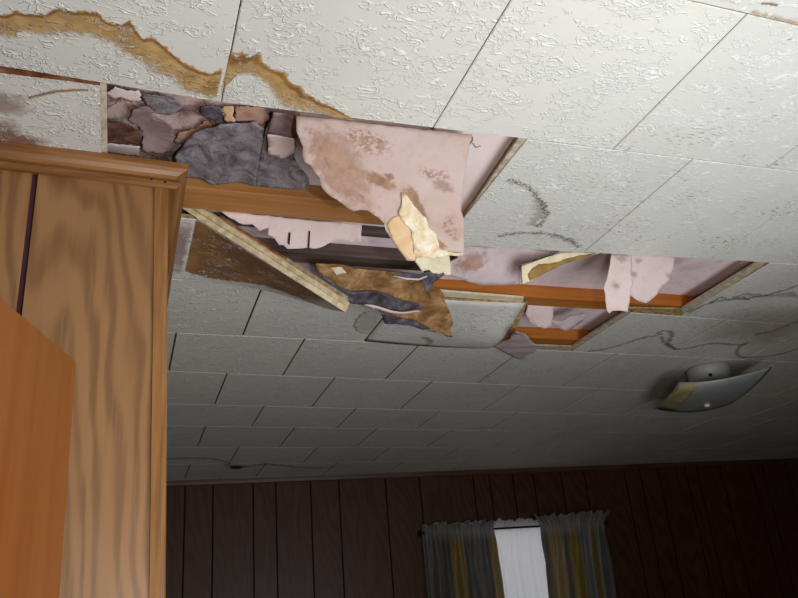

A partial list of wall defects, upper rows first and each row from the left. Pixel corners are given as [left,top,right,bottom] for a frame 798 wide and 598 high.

leakage [0,8,354,120]
leakage [0,124,37,146]
flaking render [107,86,269,157]
flaking render [267,134,295,159]